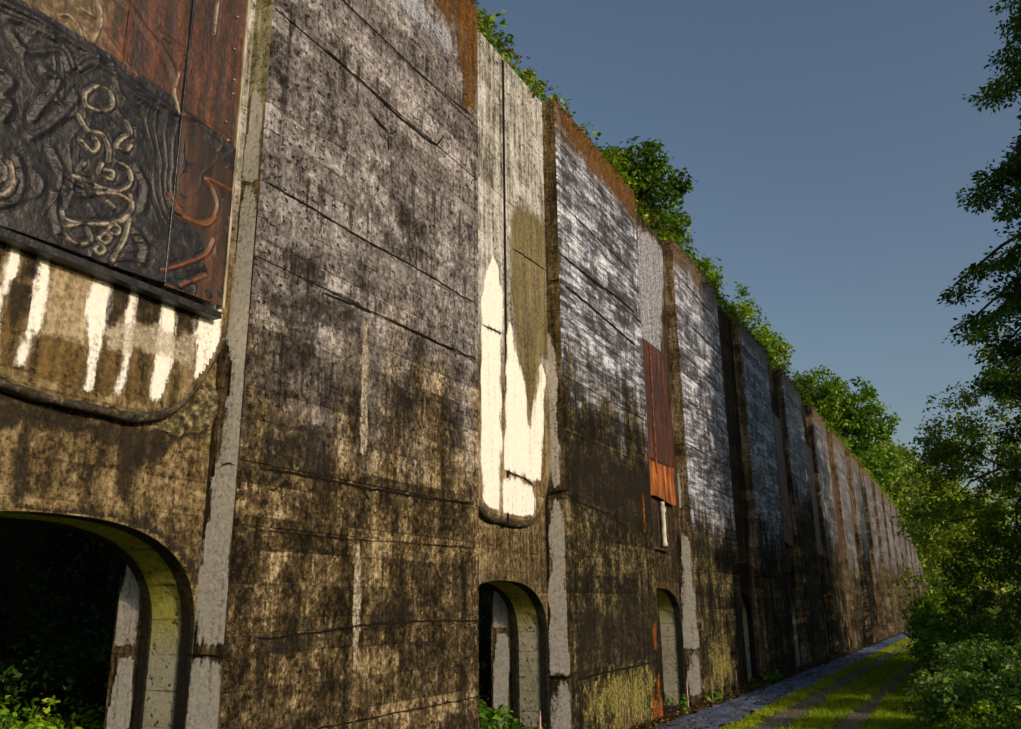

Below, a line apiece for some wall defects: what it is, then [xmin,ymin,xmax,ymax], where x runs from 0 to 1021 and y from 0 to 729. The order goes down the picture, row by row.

damp [508,206,548,426]